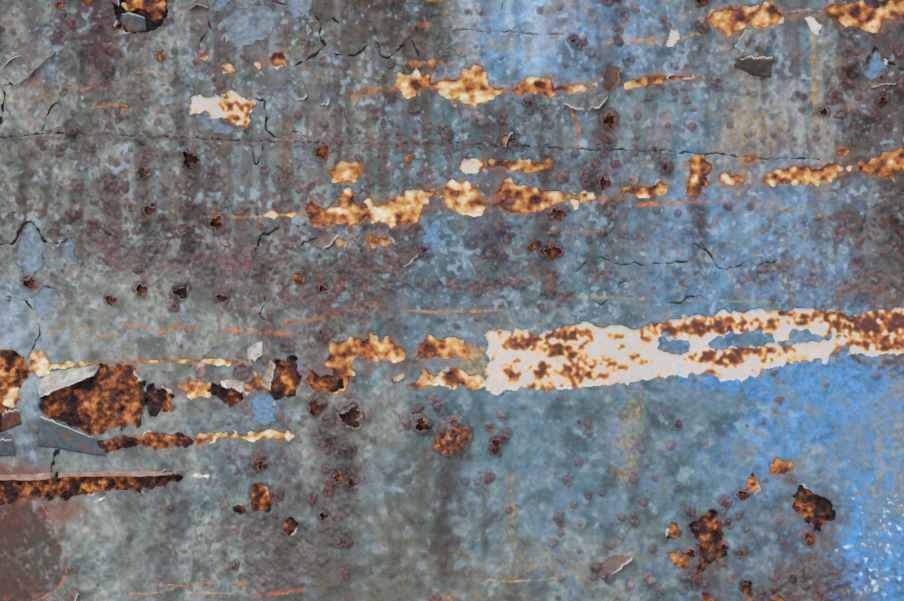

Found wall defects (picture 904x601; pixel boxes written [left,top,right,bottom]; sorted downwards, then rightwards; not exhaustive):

spalling [109,0,171,38]
rust [0,124,499,161]
rust [820,160,862,187]
rust [160,348,333,411]
rust [350,345,418,383]
peeling [0,307,904,457]
rust [458,337,489,376]
spalling [0,469,183,506]
rust [661,353,904,601]
rust [0,496,89,601]